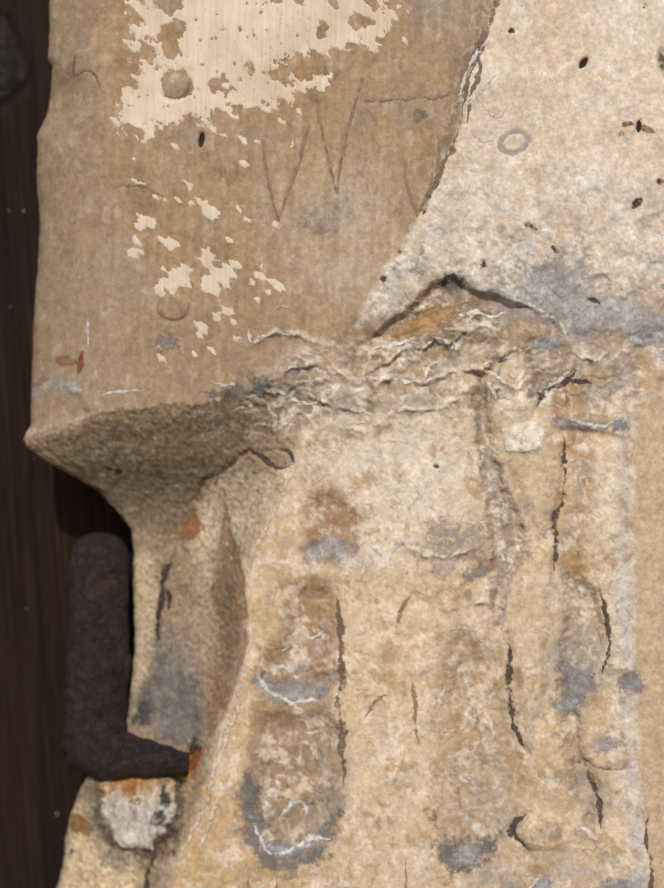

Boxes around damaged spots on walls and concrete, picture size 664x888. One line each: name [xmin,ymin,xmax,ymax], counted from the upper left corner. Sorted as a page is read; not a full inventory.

peeling [110,0,410,154]
crack [363,0,499,210]
peeling [127,212,180,260]
peeling [152,180,221,221]
peeling [154,246,242,355]
corrosion [55,351,84,374]
corrosion [178,509,201,540]
crack [551,433,568,575]
crack [334,587,349,786]
crack [505,644,528,753]
crack [599,591,612,675]
corrosion [94,737,204,805]